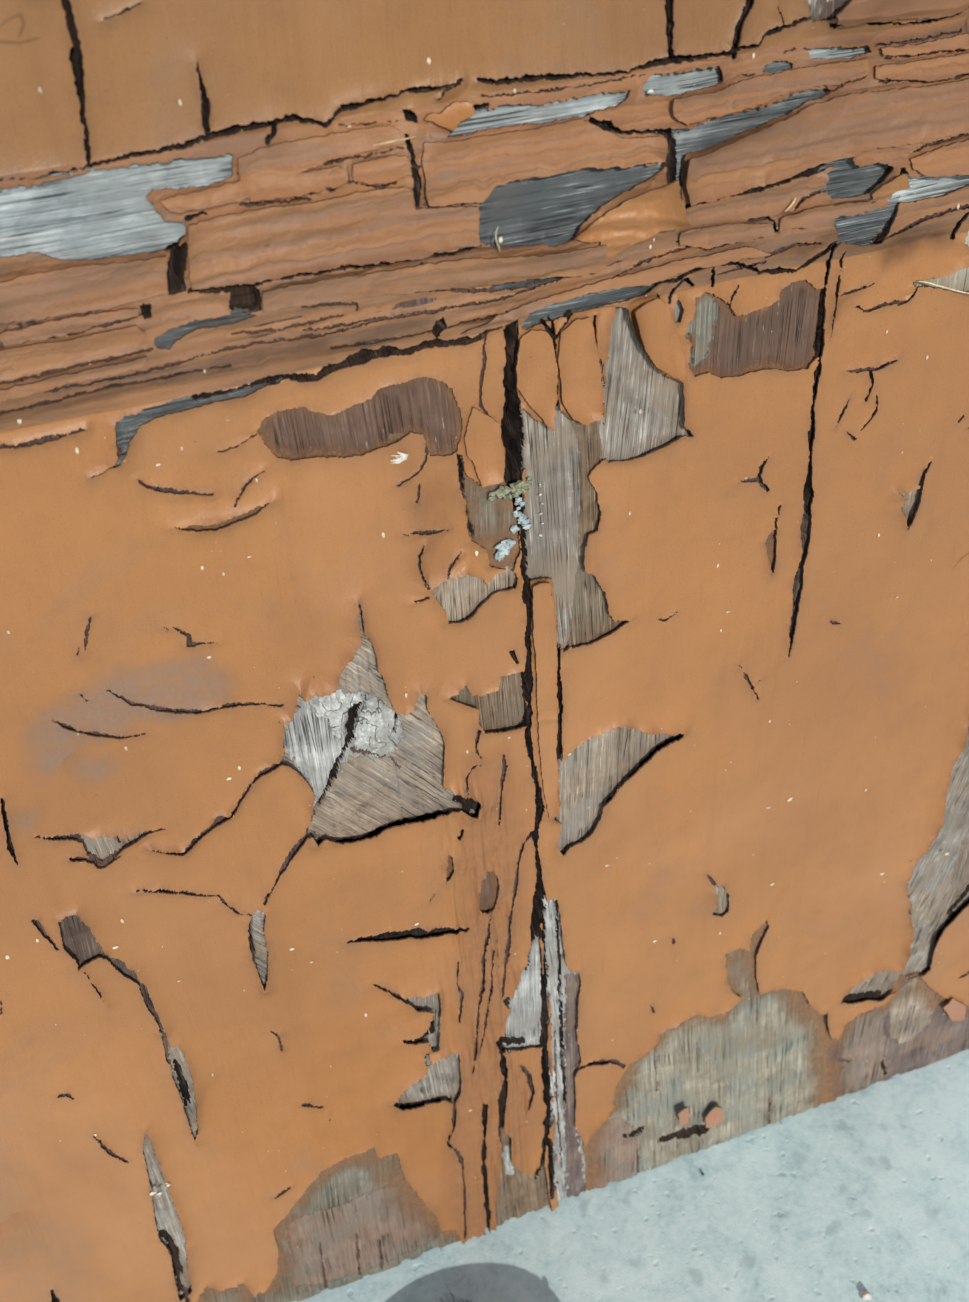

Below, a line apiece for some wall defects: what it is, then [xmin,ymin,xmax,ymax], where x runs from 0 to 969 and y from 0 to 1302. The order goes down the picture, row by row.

crack [0,0,968,209]
peeling [807,0,969,27]
crack [0,163,969,656]
peeling [0,33,969,853]
crack [0,798,18,864]
peeling [36,828,162,868]
crack [52,689,283,738]
peeling [136,604,481,989]
crack [95,1137,128,1162]
peeling [32,915,198,1139]
peeling [143,871,499,1302]
peeling [495,727,969,1226]